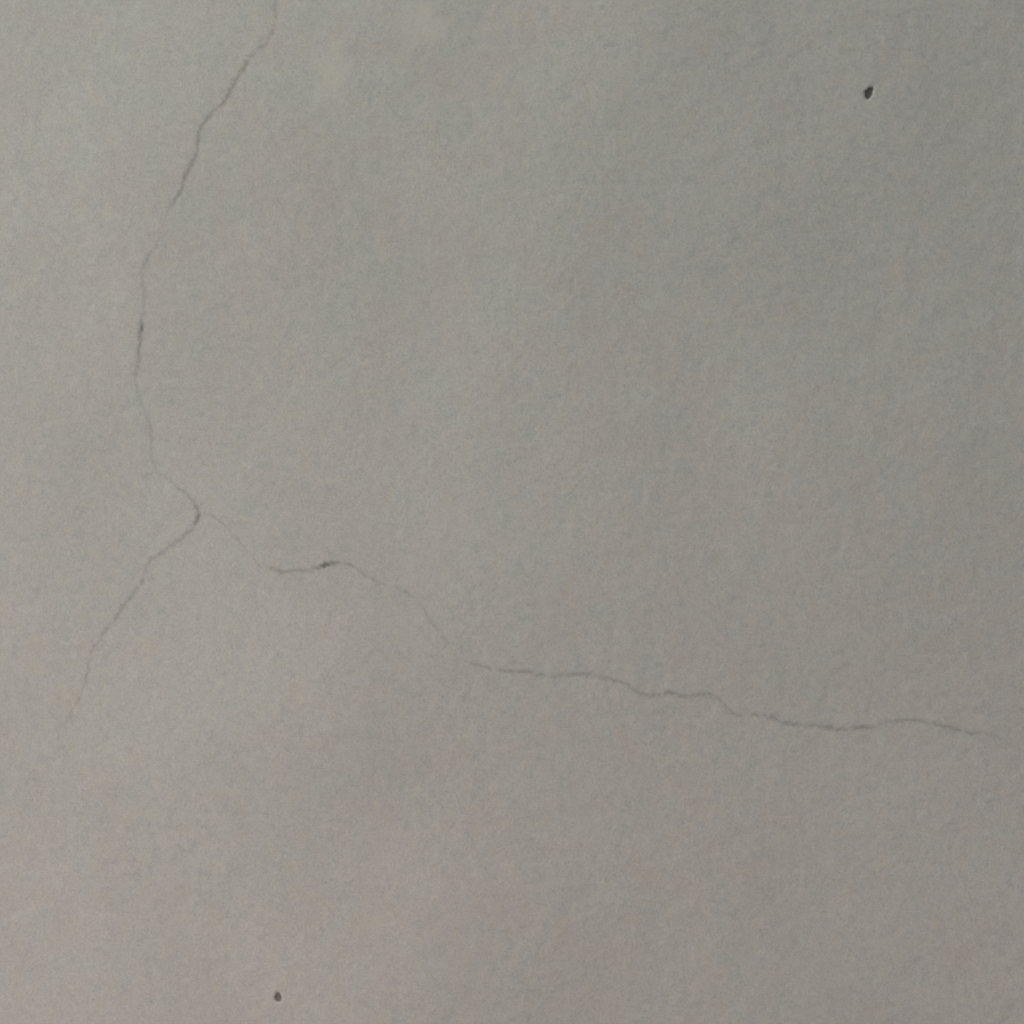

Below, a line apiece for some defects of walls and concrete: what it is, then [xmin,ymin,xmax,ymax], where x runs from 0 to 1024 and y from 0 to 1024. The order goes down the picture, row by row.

crack [59,0,282,748]